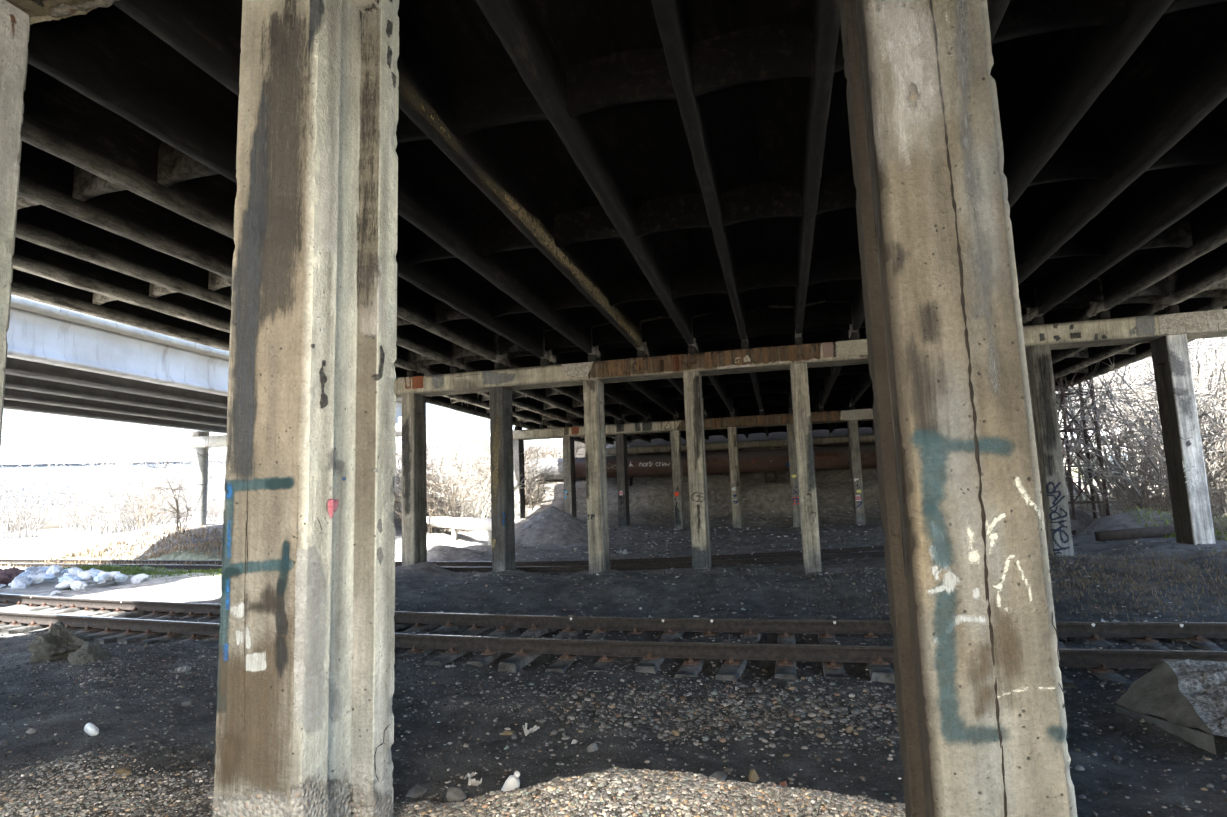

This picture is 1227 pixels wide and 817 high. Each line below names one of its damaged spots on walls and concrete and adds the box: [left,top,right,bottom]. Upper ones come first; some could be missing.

leakage [226,0,324,479]
leakage [329,451,344,473]
spalling [908,80,919,109]
crack [929,0,1007,817]